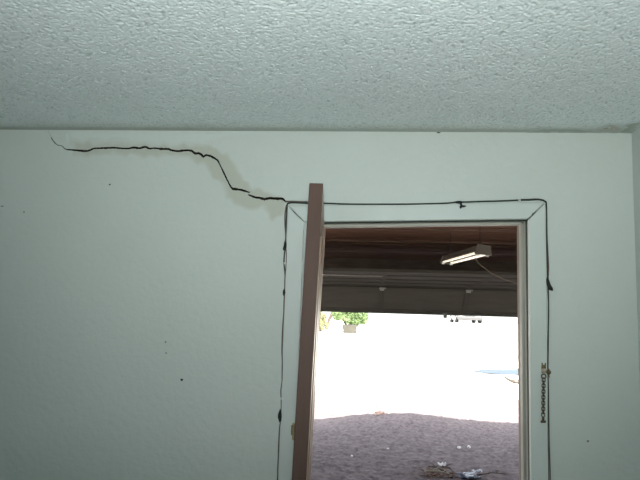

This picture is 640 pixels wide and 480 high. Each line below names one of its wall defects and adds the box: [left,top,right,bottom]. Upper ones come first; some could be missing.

crack [48,131,301,219]
leakage [68,137,288,225]